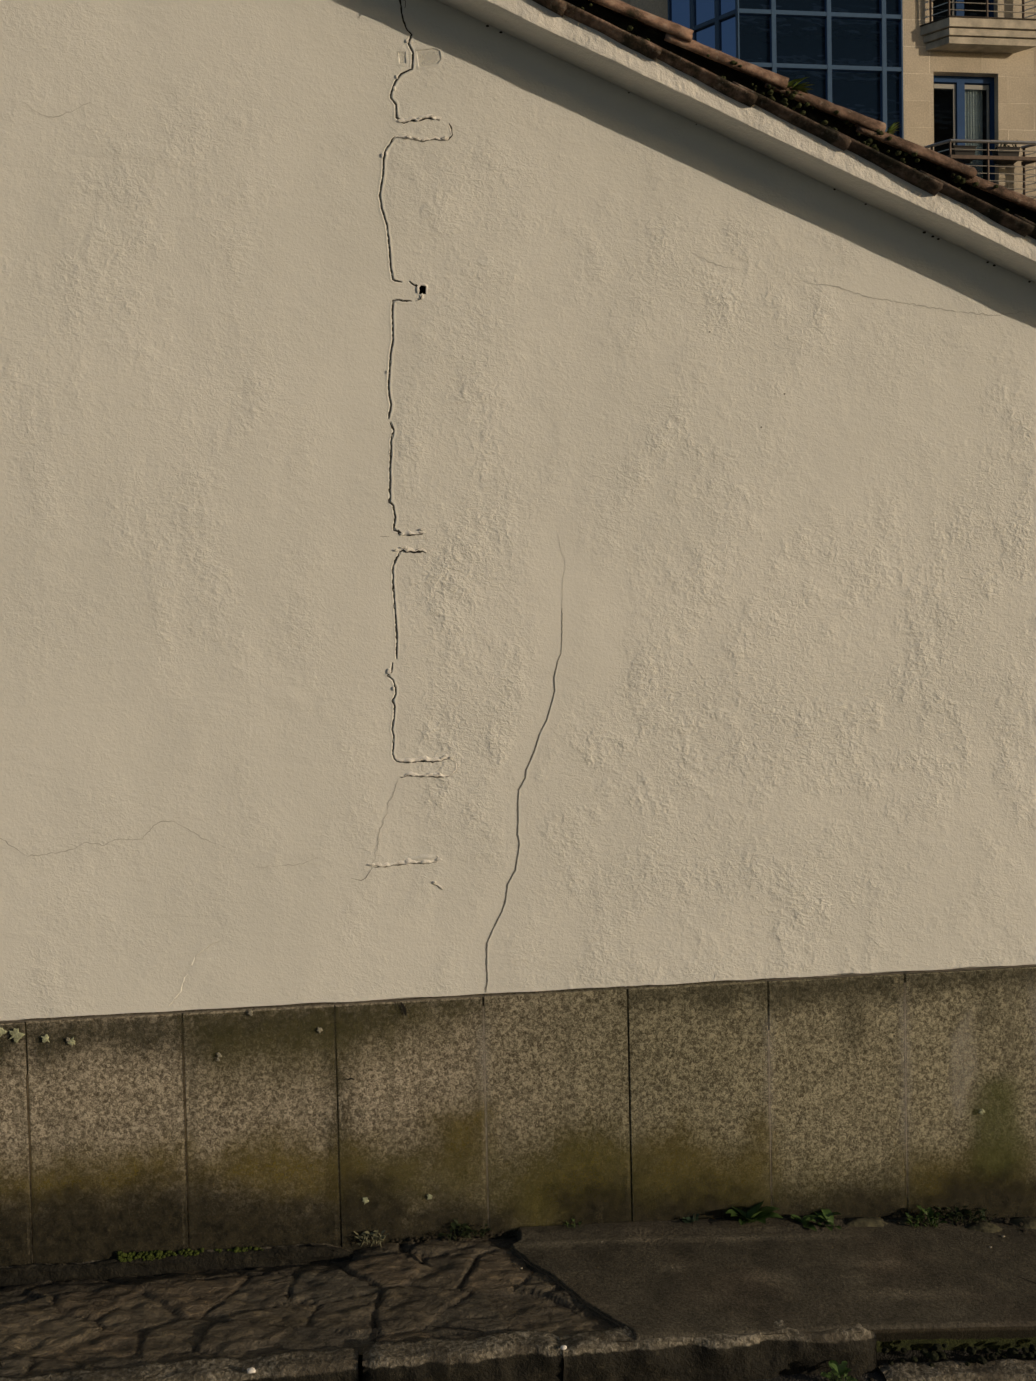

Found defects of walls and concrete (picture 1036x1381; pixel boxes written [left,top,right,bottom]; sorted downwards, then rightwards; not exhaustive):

crack [352,0,418,881]
crack [0,821,223,857]
crack [485,537,565,993]
leakage [0,1114,513,1267]
leakage [557,1175,1036,1225]